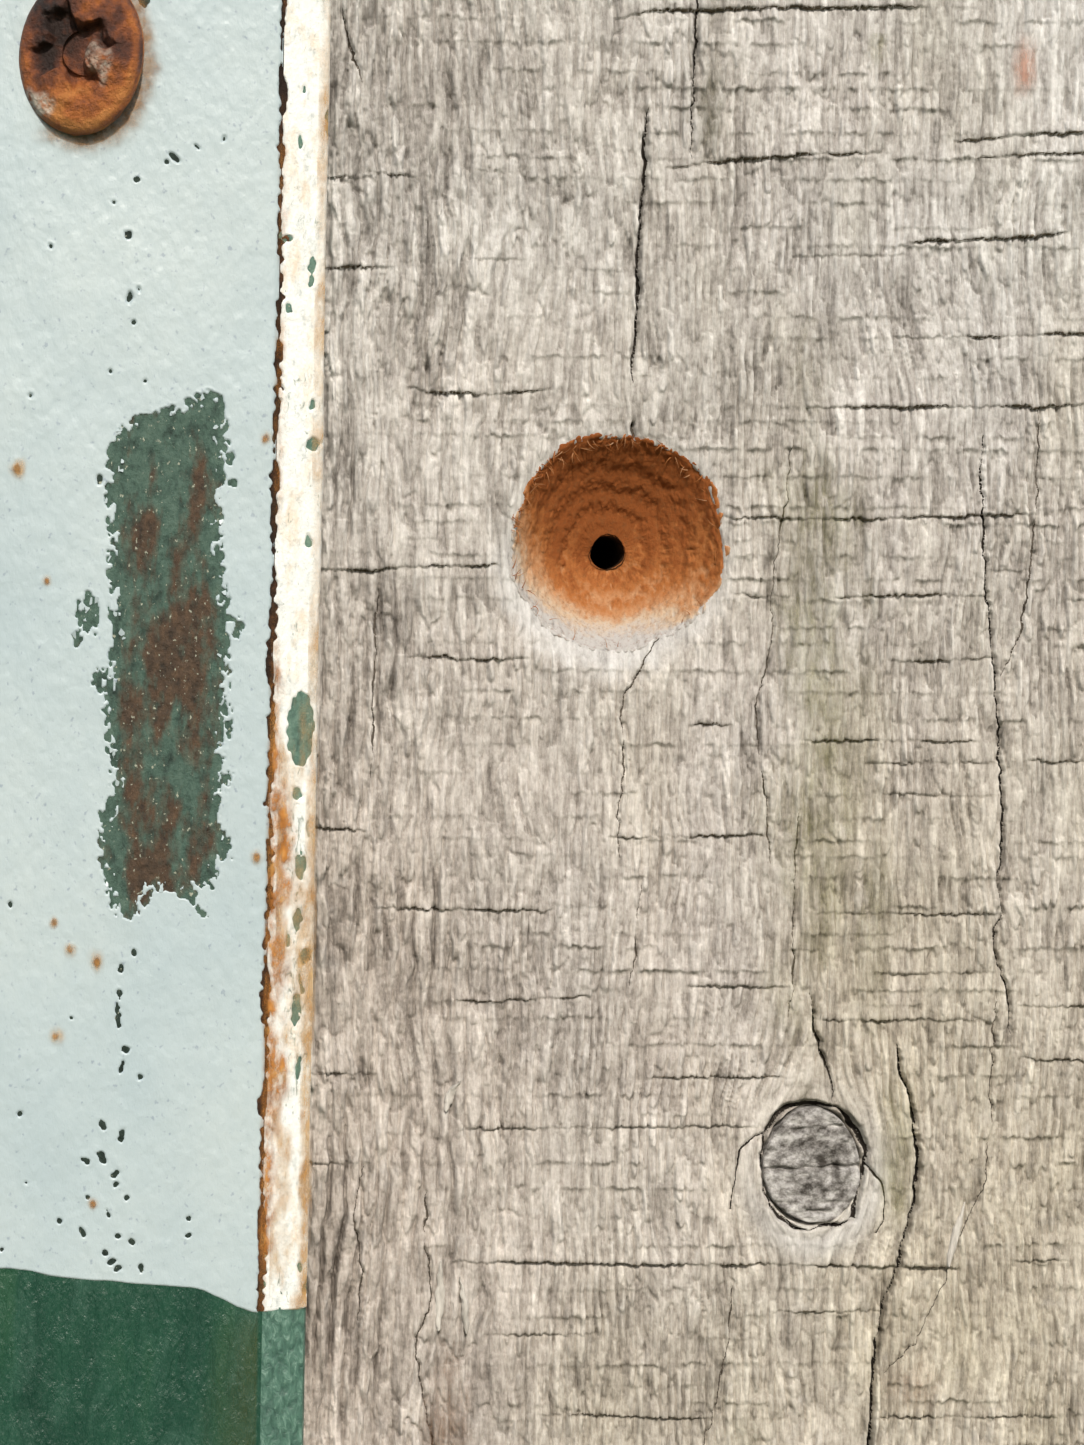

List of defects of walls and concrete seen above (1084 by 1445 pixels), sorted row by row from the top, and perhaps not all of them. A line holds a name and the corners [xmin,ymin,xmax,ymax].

rust [76,3,151,145]
crack [630,108,649,382]
peeling [72,391,245,920]
rust [254,0,317,1311]
crack [729,439,947,1445]
crack [960,410,1040,1237]
crack [703,1285,733,1445]